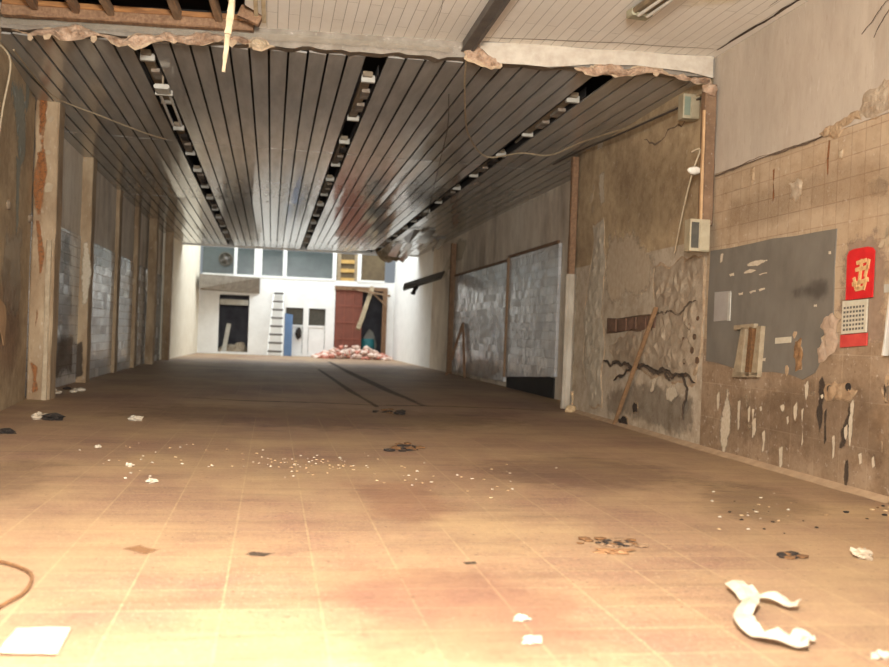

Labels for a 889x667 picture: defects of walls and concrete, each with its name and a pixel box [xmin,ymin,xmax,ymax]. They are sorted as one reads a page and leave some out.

spalling [819,79,889,139]
crack [656,300,696,315]
spalling [785,331,803,376]
peeling [817,313,841,363]
crack [603,360,695,420]
peeling [780,381,809,424]
spalling [821,381,858,439]